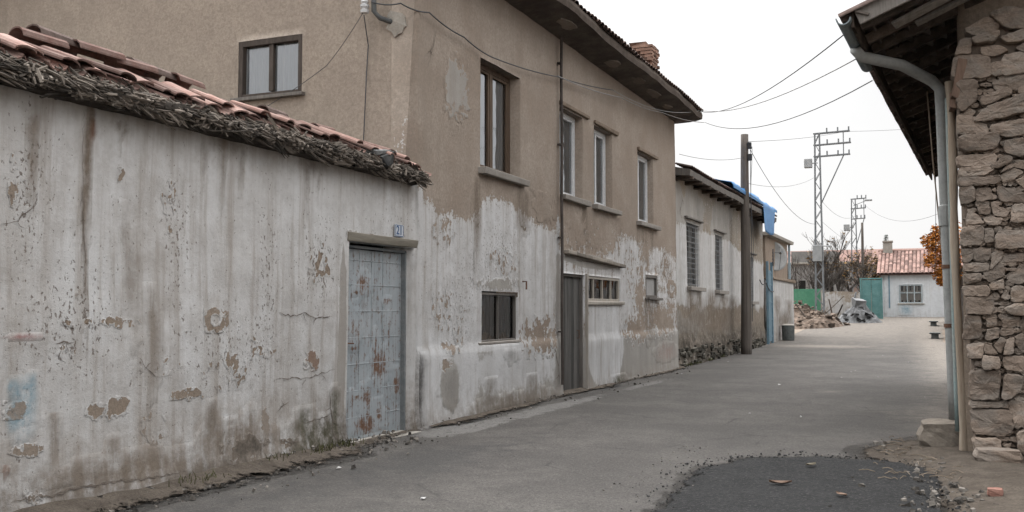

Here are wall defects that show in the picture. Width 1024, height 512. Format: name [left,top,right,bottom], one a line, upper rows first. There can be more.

water stain [75,106,98,385]
spalling [308,240,332,287]
spalling [470,245,522,292]
spalling [559,203,741,360]
spalling [61,316,142,329]
spalling [204,307,230,334]
spalling [170,333,277,402]
spalling [303,349,319,372]
corrosion [346,308,399,438]
spalling [518,313,561,361]
spalling [84,395,131,421]
spalling [7,442,43,460]